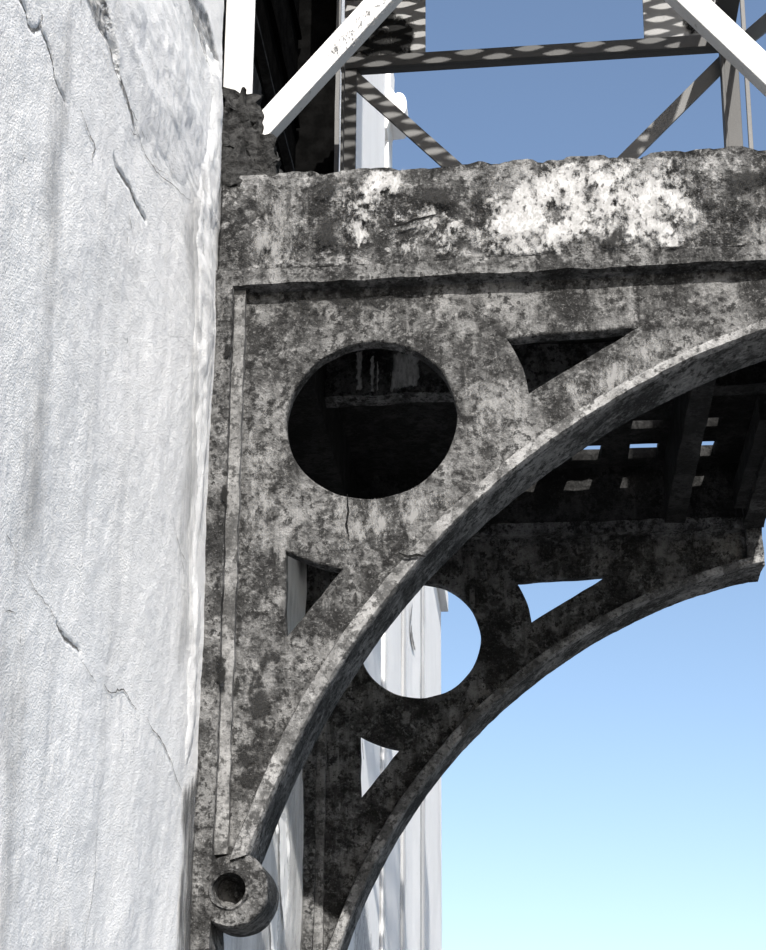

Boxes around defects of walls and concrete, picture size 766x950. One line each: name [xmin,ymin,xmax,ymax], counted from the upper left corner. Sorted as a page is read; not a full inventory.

crack [19,0,145,231]
rust [353,12,415,56]
crack [7,535,182,790]
rust [179,774,199,950]
peeling [270,812,290,950]